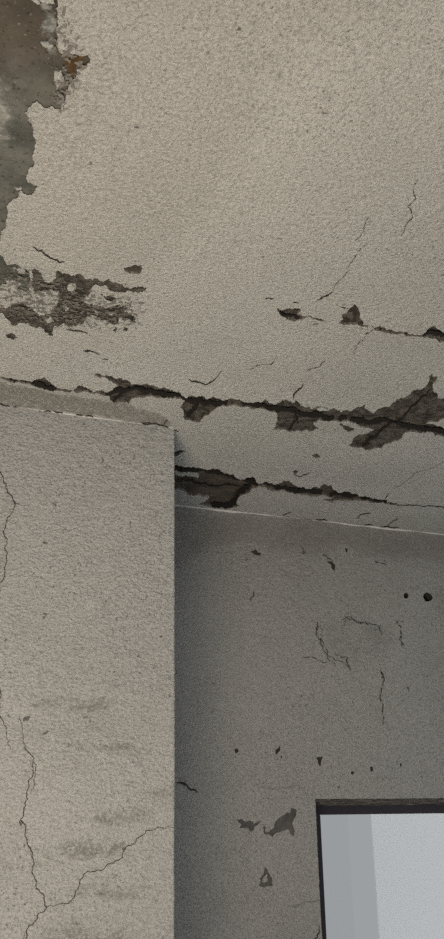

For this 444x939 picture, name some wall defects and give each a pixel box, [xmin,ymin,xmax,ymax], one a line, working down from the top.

flaking render [0,0,91,239]
peeling [0,255,146,340]
flaking render [277,308,324,322]
crack [265,218,369,309]
flaking render [339,304,369,327]
crack [0,329,444,450]
crack [0,472,16,583]
crack [174,463,444,529]
crack [305,617,404,671]
crack [0,690,172,939]
peeling [238,808,297,837]
peeling [259,868,273,887]